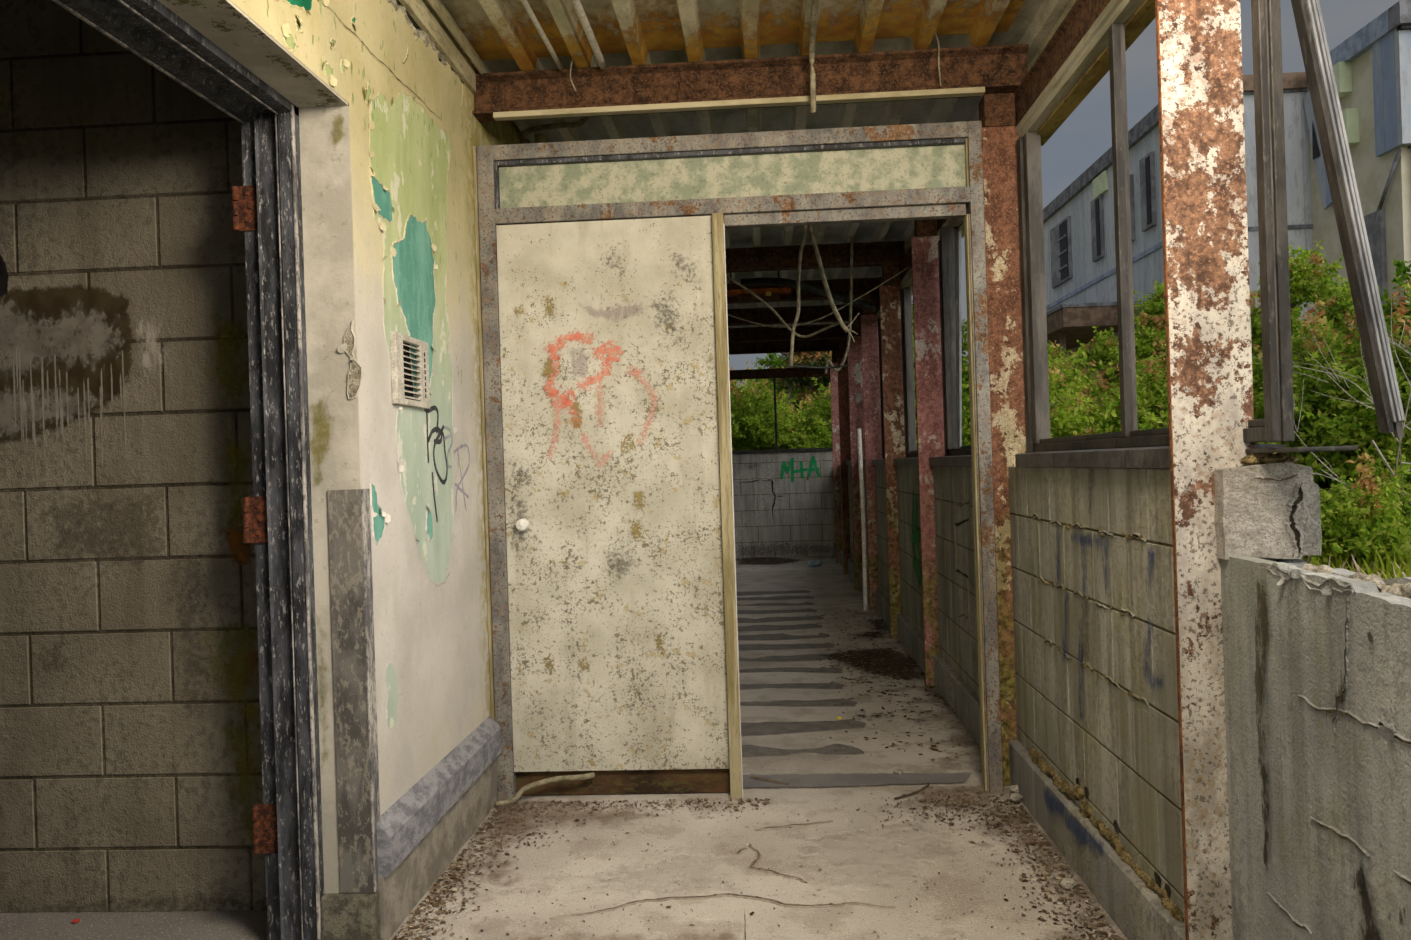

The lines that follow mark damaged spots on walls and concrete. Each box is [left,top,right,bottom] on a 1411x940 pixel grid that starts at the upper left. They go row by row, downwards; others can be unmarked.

peeling [267,0,468,587]
crack [1253,473,1307,559]
spalling [1267,562,1411,600]
crack [1297,595,1411,746]
crack [550,820,896,920]
crack [1267,891,1312,935]
crack [1310,816,1411,886]